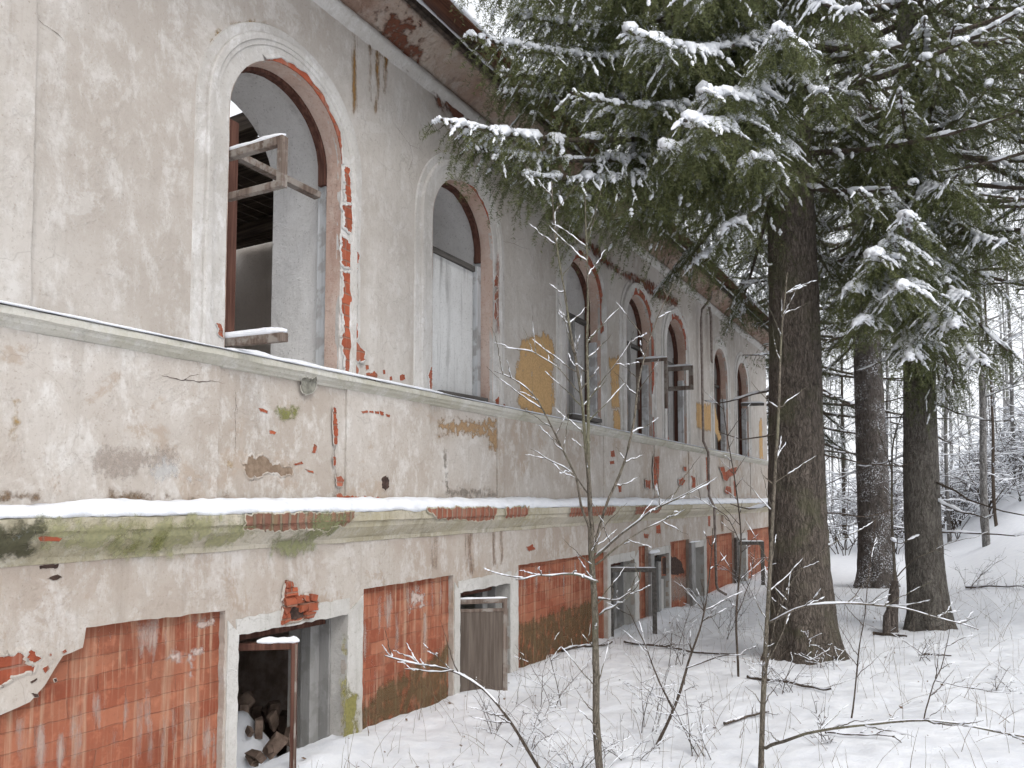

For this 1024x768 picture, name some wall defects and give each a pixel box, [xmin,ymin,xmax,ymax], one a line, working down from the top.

flaking render [375,5,424,64]
flaking render [435,94,470,121]
flaking render [263,53,405,382]
peeling [493,331,555,415]
crack [164,374,238,454]
flaking render [242,444,317,481]
leakage [0,519,46,559]
flaking render [243,474,390,534]
flaking render [426,505,530,523]
flaking render [280,580,320,626]
leakage [519,602,592,668]
flaking render [0,646,67,698]